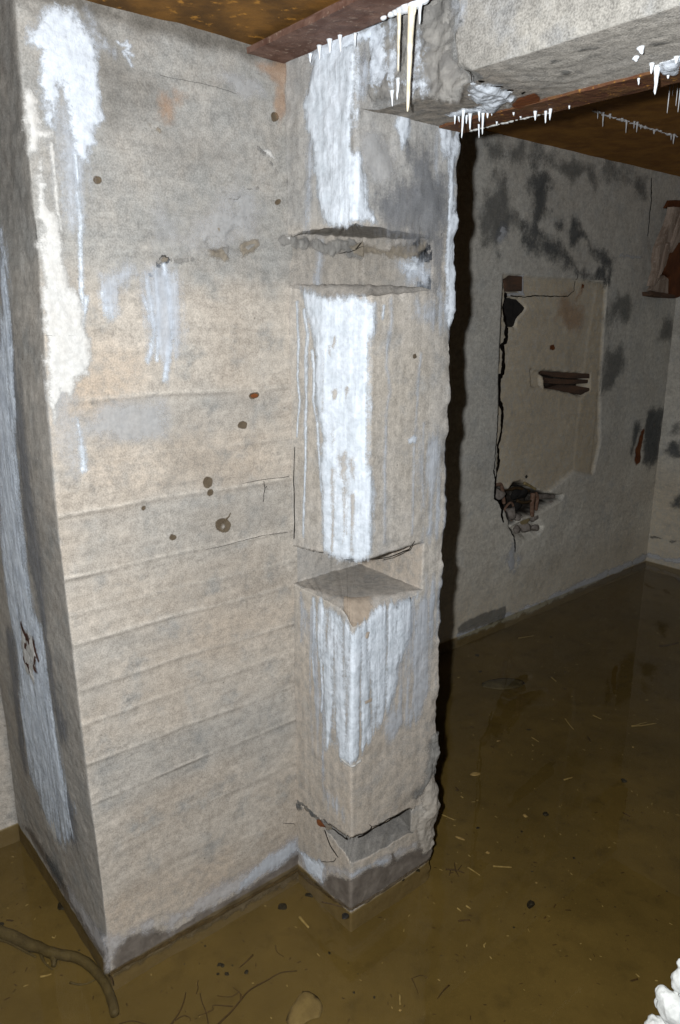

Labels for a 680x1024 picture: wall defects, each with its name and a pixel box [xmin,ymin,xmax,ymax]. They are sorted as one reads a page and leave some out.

water stain [116,41,134,67]
water stain [380,0,429,21]
water stain [23,3,105,424]
water stain [144,262,179,382]
spalling [278,235,426,283]
water stain [303,27,552,328]
water stain [521,172,642,284]
water stain [296,288,392,562]
crack [493,277,578,551]
water stain [630,408,680,465]
water stain [301,583,440,767]
water stain [26,827,432,977]